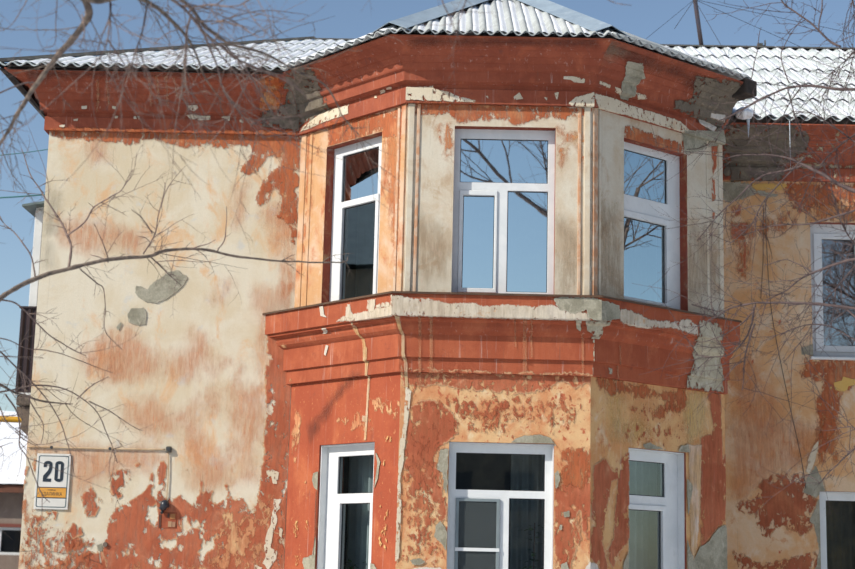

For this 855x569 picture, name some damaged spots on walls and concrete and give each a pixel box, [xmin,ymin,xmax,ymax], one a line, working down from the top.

peeling [49,61,855,273]
spalling [116,270,187,330]
peeling [22,321,308,569]
peeling [336,294,855,569]
spalling [295,538,316,569]